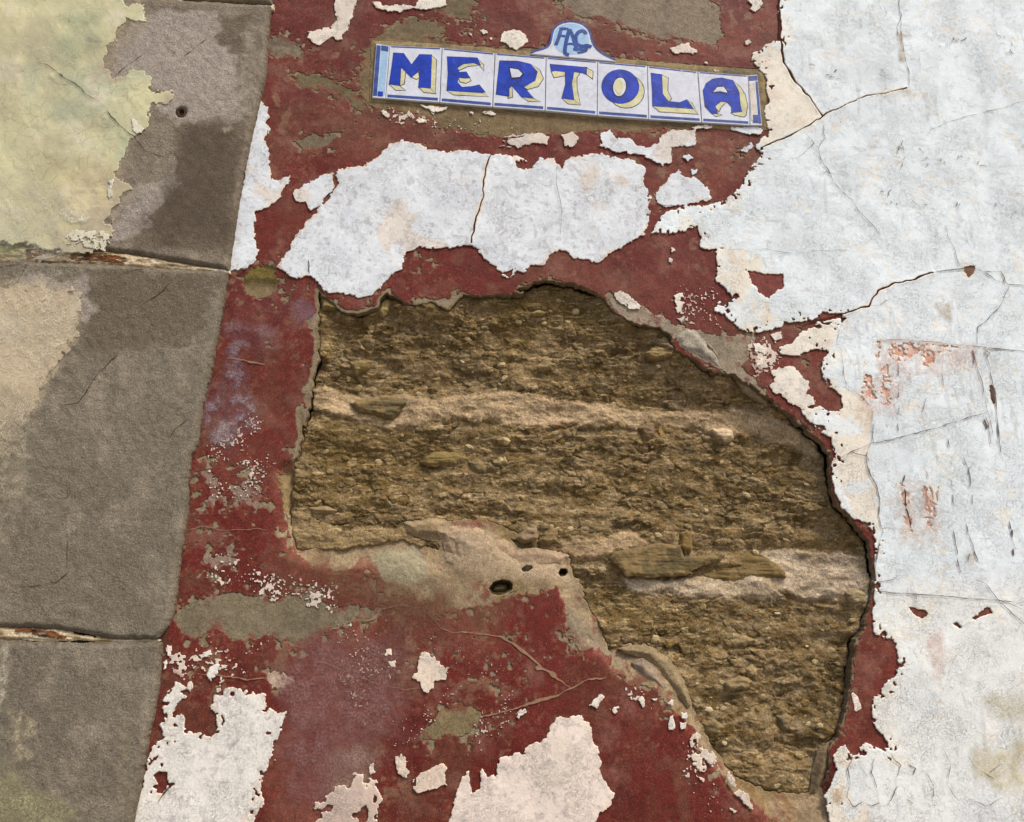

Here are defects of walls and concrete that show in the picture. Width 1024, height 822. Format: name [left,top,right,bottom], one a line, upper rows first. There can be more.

peeling [0,0,174,254]
crack [455,154,491,244]
crack [762,0,909,230]
spalling [230,0,870,822]
crack [802,229,1024,620]
corrosion [15,628,67,639]
crack [361,603,605,716]